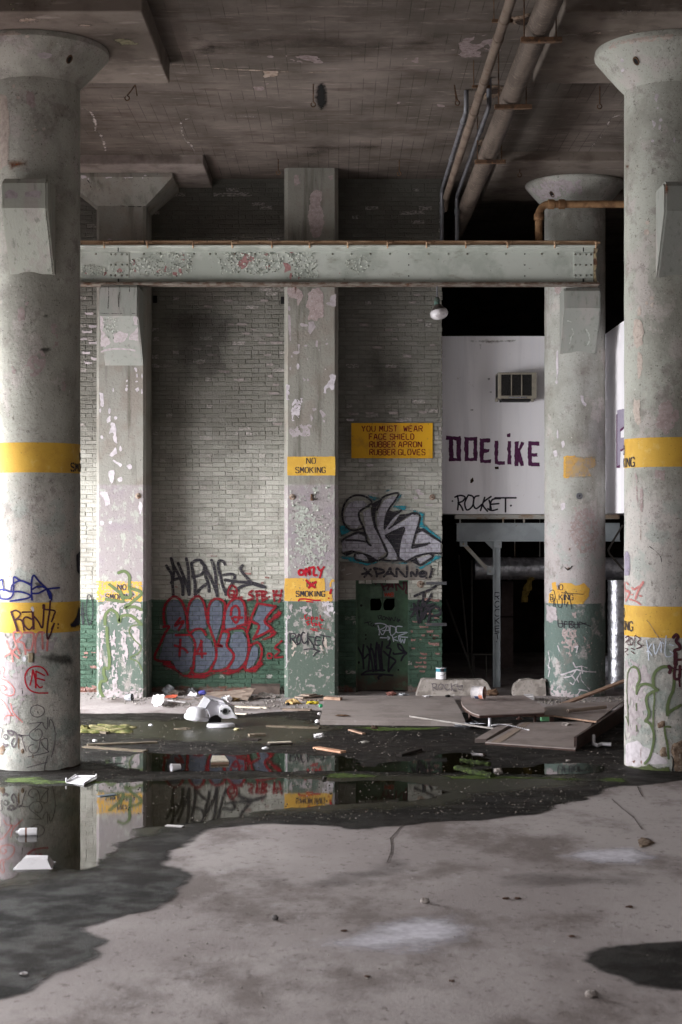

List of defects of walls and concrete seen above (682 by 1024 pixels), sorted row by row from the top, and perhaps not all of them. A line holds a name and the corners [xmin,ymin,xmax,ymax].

peeling [452,35,501,58]
peeling [80,252,193,277]
peeling [217,252,336,438]
peeling [99,368,143,506]
peeling [81,602,143,698]
damp [0,710,682,999]
crack [386,824,403,862]